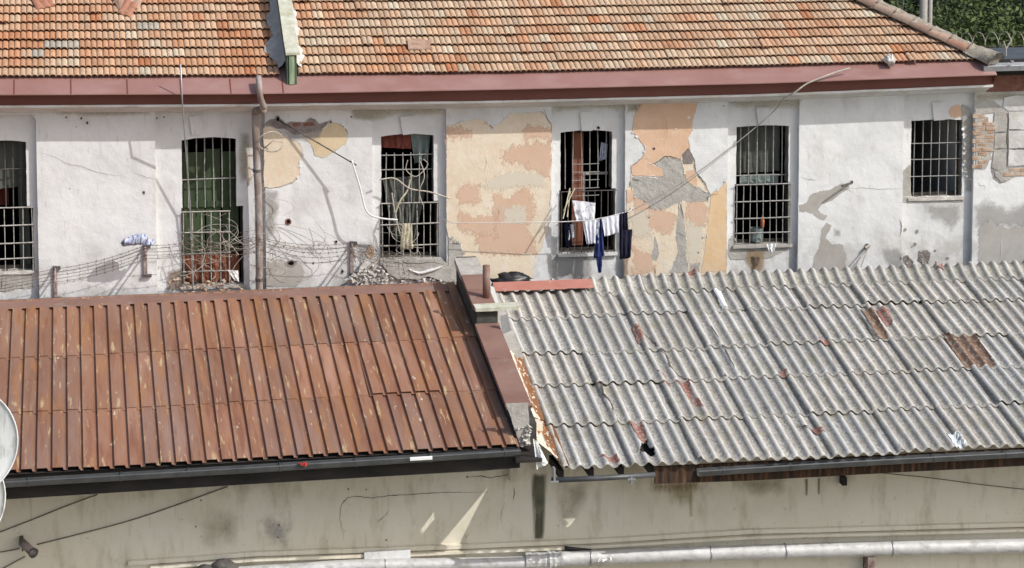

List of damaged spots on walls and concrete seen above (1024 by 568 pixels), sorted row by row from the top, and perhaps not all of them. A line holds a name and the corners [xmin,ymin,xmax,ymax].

peeling [246,116,352,188]
peeling [341,111,553,285]
peeling [626,103,790,276]
flaking render [949,95,1024,183]
corrosion [0,270,520,472]
spalling [514,424,532,447]
damp [533,474,545,538]